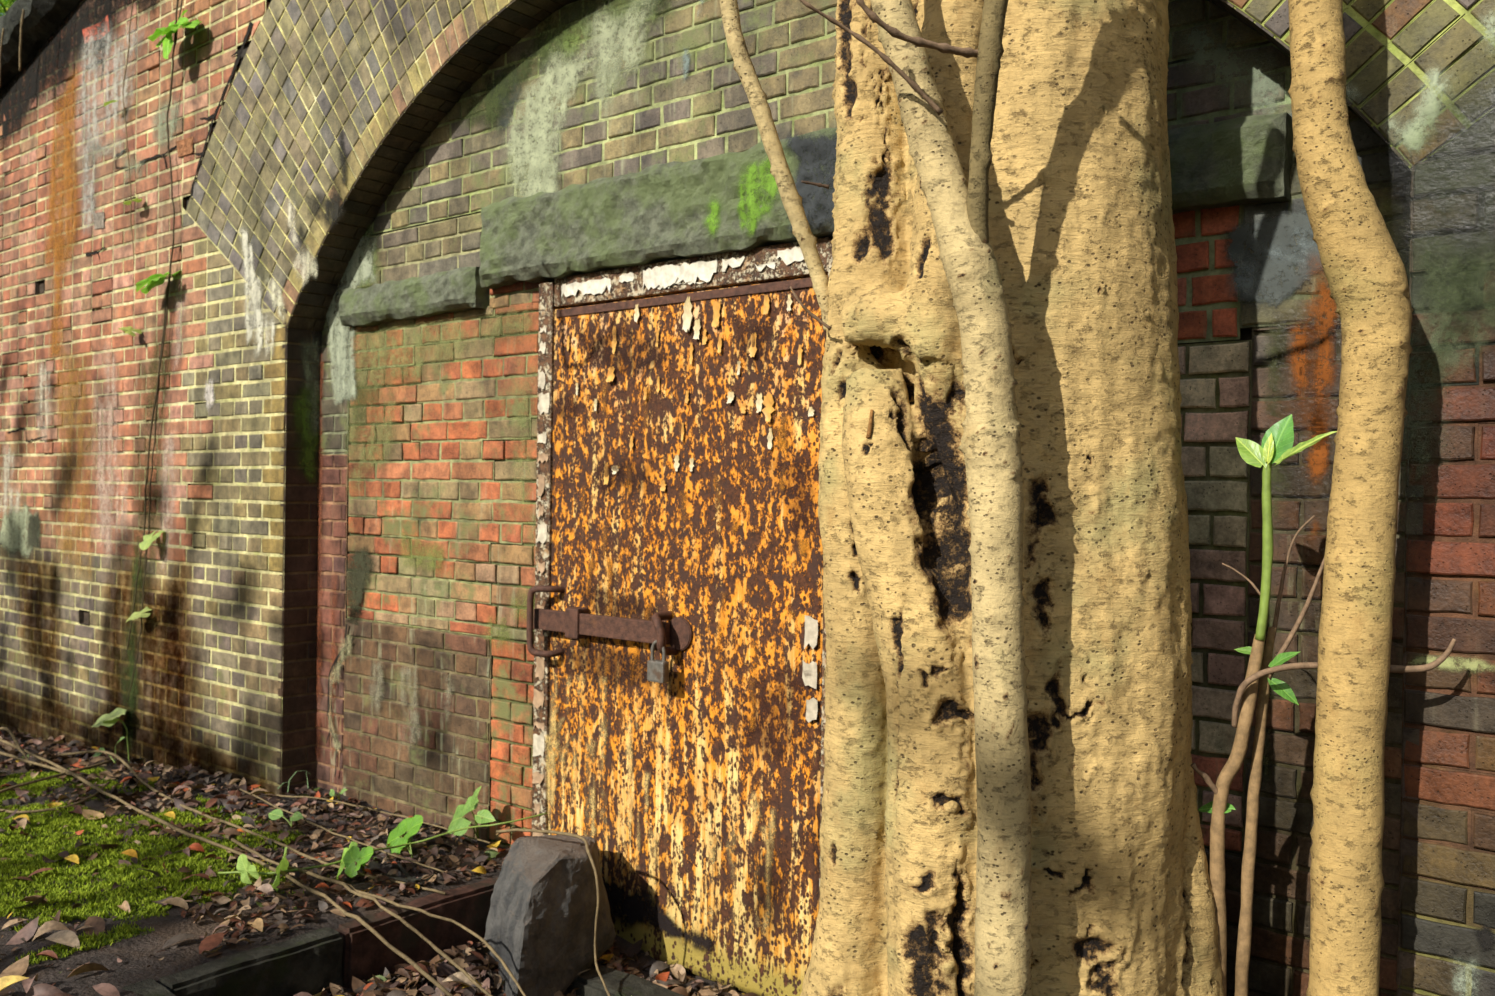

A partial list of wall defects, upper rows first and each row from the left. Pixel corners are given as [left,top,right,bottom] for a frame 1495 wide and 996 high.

leakage [520,163,557,197]
leakage [288,200,317,281]
leakage [241,230,284,352]
peeling [561,247,804,366]
peeling [606,326,617,382]
corrosion [579,328,661,369]
peeling [727,333,775,450]
corrosion [1291,281,1337,477]
corrosion [598,462,646,489]
peeling [660,423,694,491]
leakage [0,560,272,793]
corrosion [603,880,712,951]